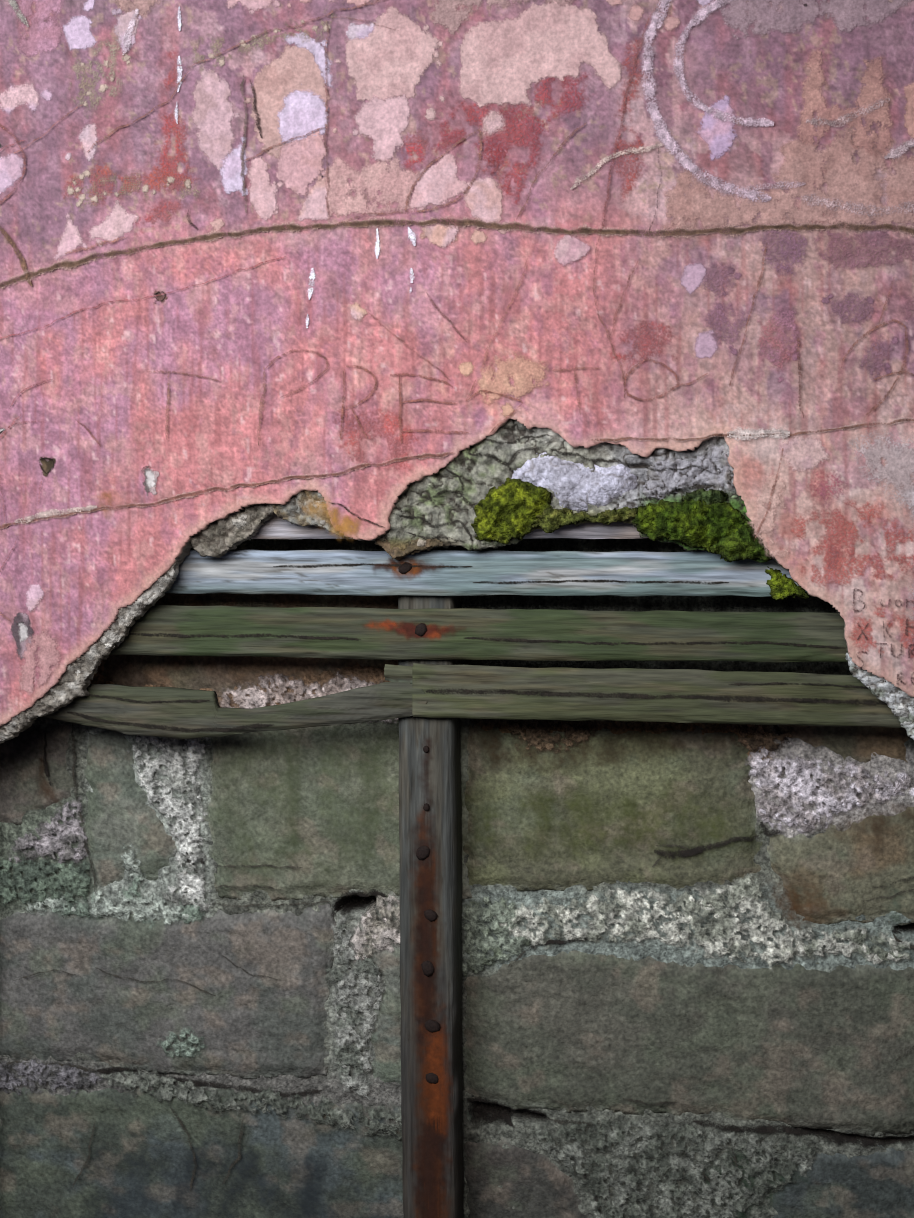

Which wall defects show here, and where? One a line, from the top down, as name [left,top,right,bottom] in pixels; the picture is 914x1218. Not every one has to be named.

crack [0,0,914,387]
crack [0,452,453,529]
spalling [375,354,788,563]
corrosion [374,559,436,576]
spalling [0,558,181,743]
corrosion [369,621,450,638]
spalling [0,735,211,927]
crack [652,822,780,867]
spalling [714,723,914,833]
spalling [462,874,910,976]
corrosion [414,815,449,1218]
crack [626,1098,914,1199]